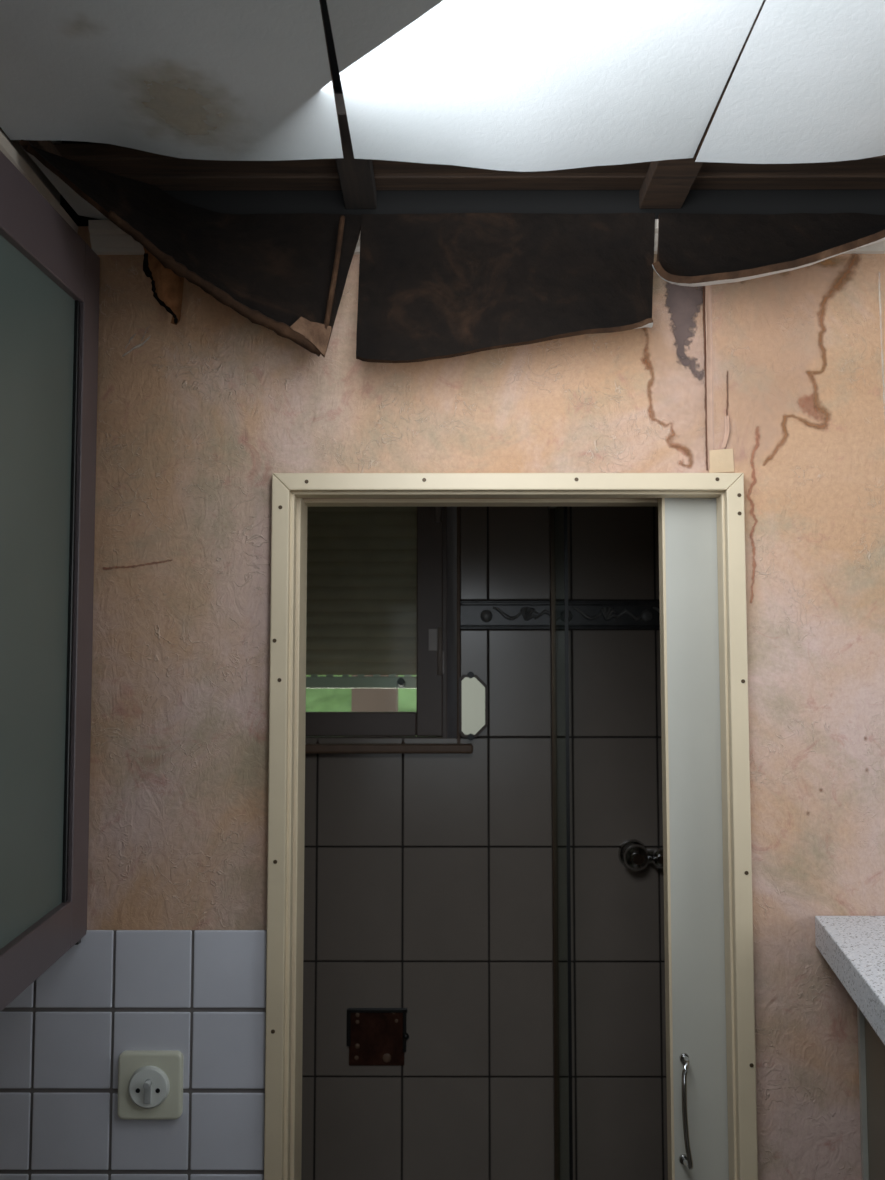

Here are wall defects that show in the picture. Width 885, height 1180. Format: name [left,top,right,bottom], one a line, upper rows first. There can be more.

water stain [643,327,693,467]
water stain [665,282,704,379]
water stain [747,254,858,603]